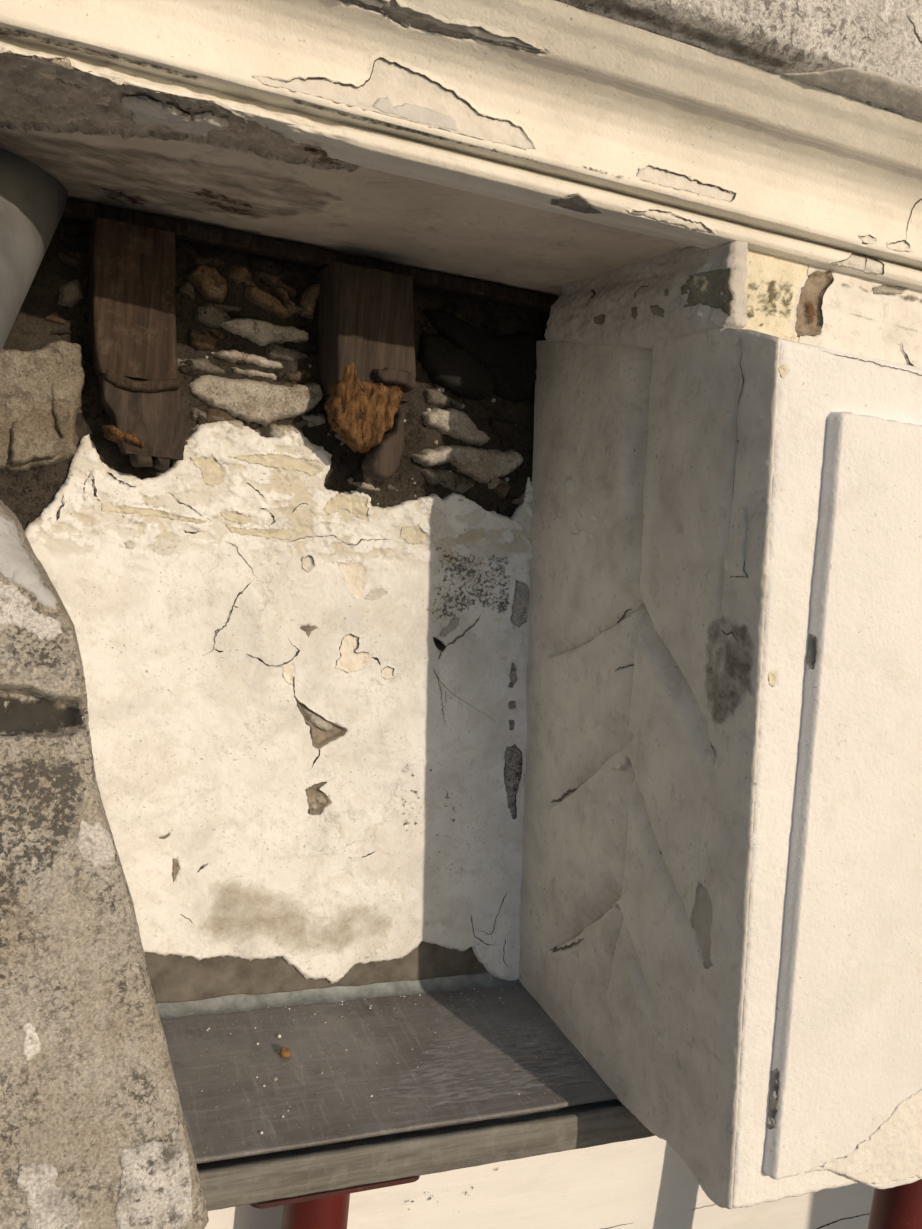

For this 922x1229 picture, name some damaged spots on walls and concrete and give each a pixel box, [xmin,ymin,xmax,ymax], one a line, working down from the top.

peeling [340,0,547,53]
flaking render [0,46,359,173]
peeling [251,51,539,153]
peeling [631,268,734,320]
crack [56,472,138,522]
crack [246,482,394,548]
peeling [0,515,63,641]
crack [167,492,302,694]
flaking render [283,662,347,765]
crack [434,615,489,722]
flaking render [305,778,332,815]
crack [817,1213,870,1229]